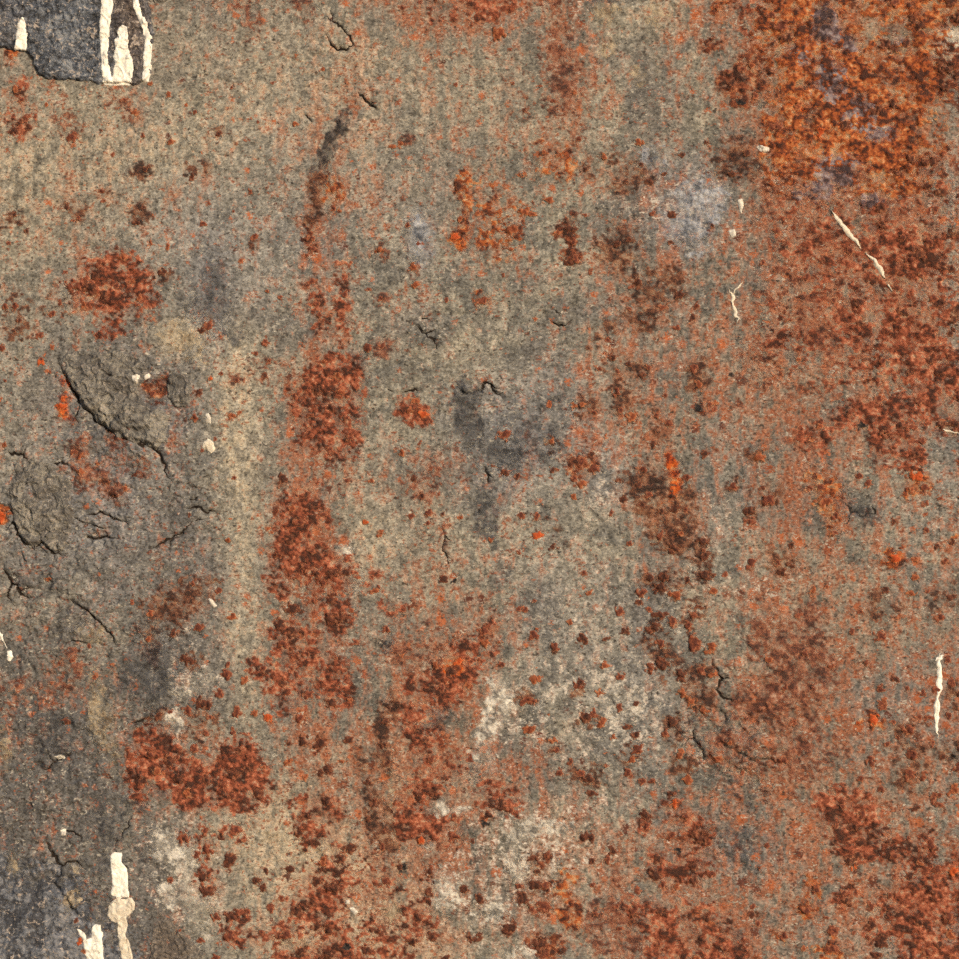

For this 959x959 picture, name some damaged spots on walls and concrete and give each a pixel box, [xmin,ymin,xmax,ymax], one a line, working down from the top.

peeling [0,0,167,86]
rust [700,0,959,536]
crack [58,359,170,479]
peeling [63,350,192,450]
peeling [8,457,73,551]
crack [74,511,129,540]
crack [149,497,212,549]
crack [65,599,116,646]
rust [124,472,506,959]
rust [609,409,959,959]
peeling [0,846,204,959]
rust [515,791,794,959]